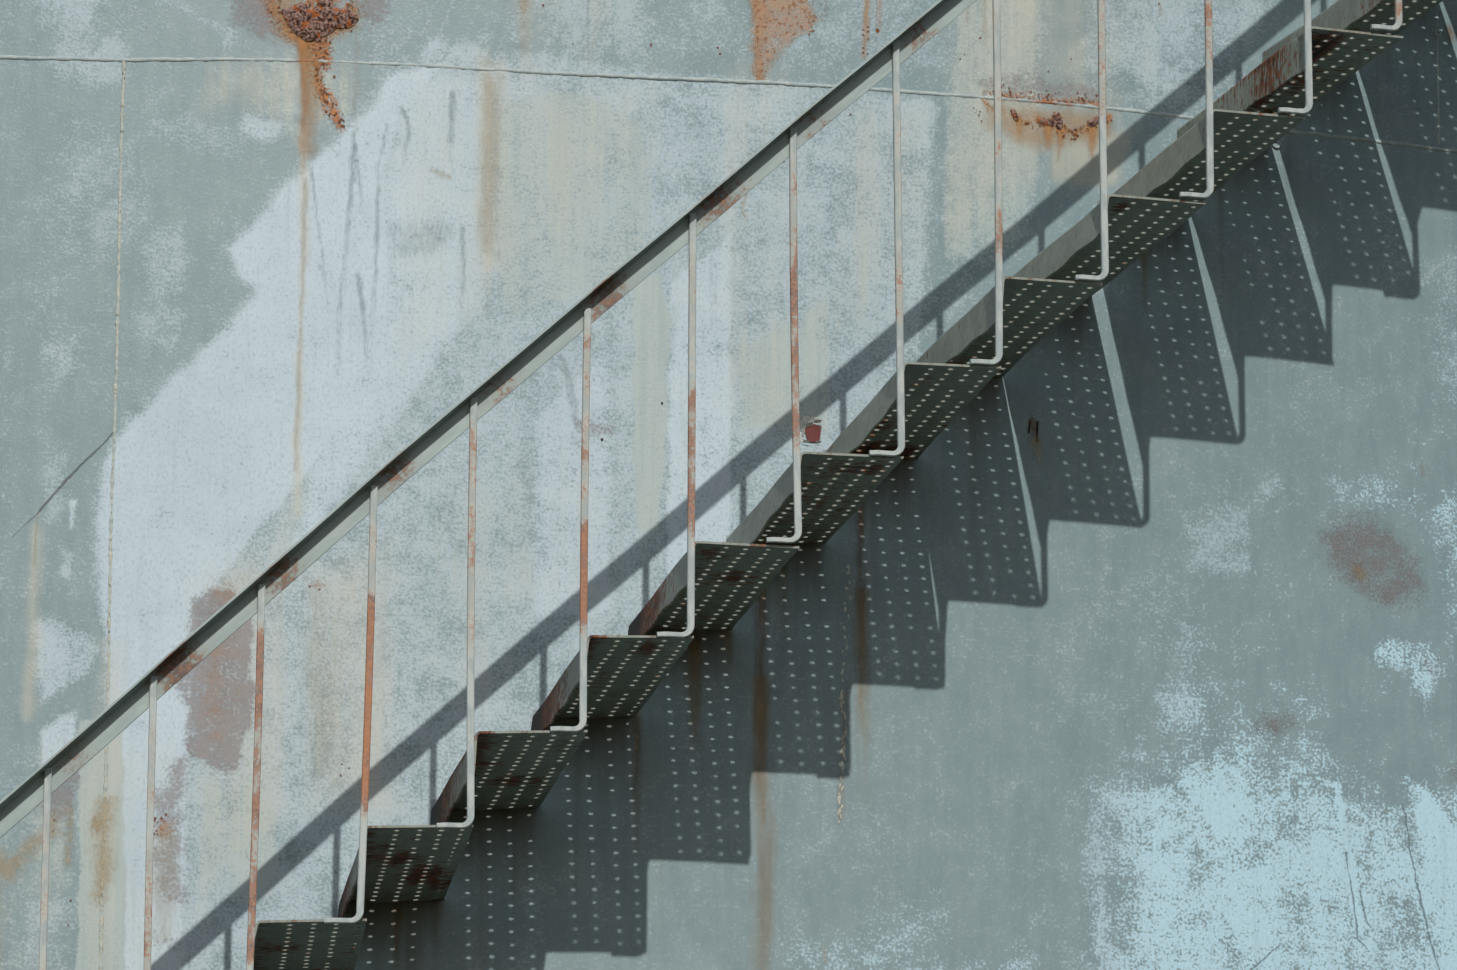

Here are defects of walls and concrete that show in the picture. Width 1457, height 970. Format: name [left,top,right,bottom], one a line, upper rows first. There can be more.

rust [238,0,384,129]
rust [752,0,817,80]
rust [973,71,1113,140]